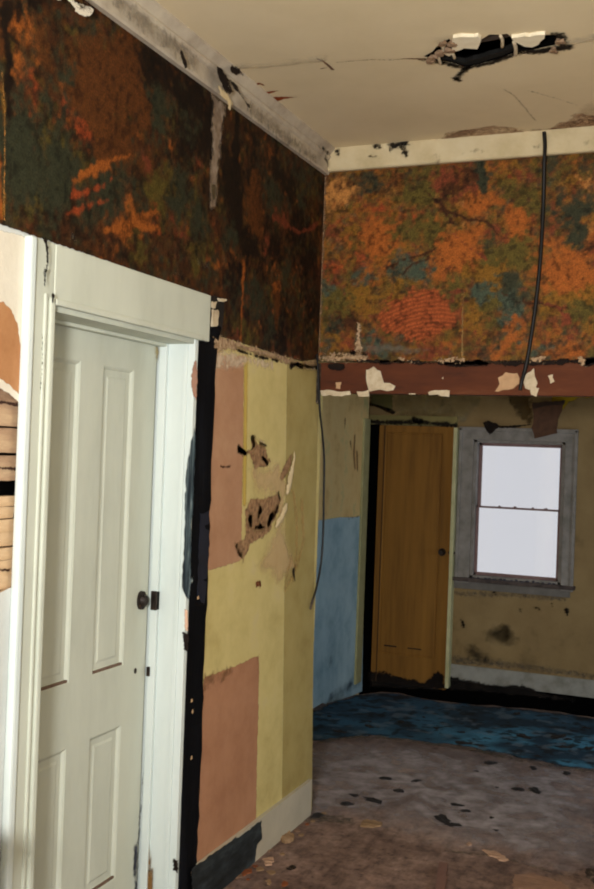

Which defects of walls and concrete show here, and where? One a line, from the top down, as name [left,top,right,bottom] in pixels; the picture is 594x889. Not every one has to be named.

spalling [68,0,94,17]
peeling [452,33,481,52]
peeling [511,31,545,47]
peeling [369,141,409,157]
flaking render [0,302,21,401]
flaking render [208,295,368,570]